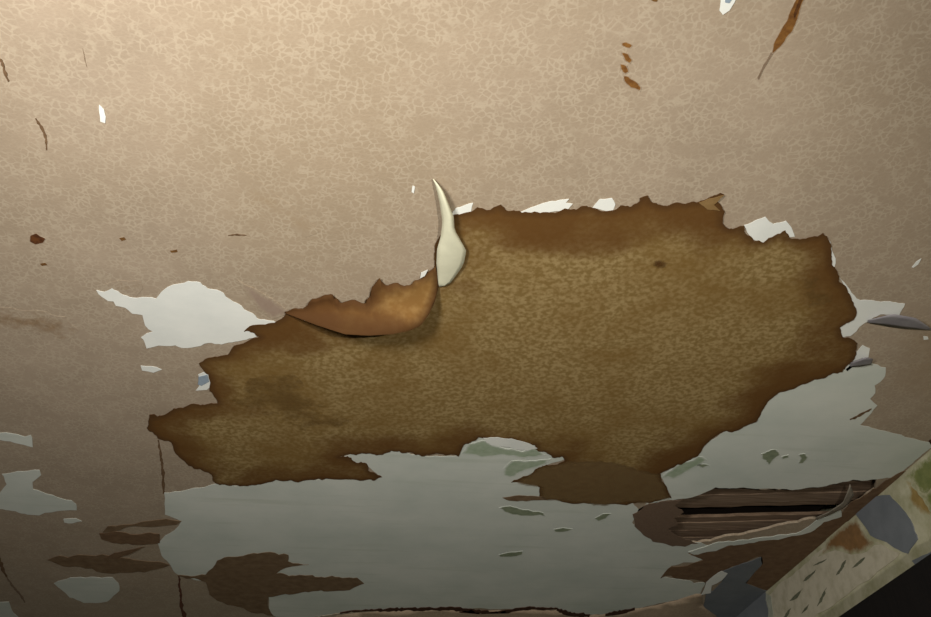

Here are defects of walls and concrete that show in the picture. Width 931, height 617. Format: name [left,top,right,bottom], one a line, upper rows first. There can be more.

crack [0,59,9,82]
corrosion [620,42,641,91]
corrosion [758,0,804,80]
peeling [452,203,473,215]
peeling [97,281,275,348]
leakage [147,193,857,505]
peeling [0,470,81,523]
crack [157,440,165,494]
peeling [158,345,931,617]
crack [0,558,25,603]
peeling [54,577,120,603]
crack [178,576,186,617]